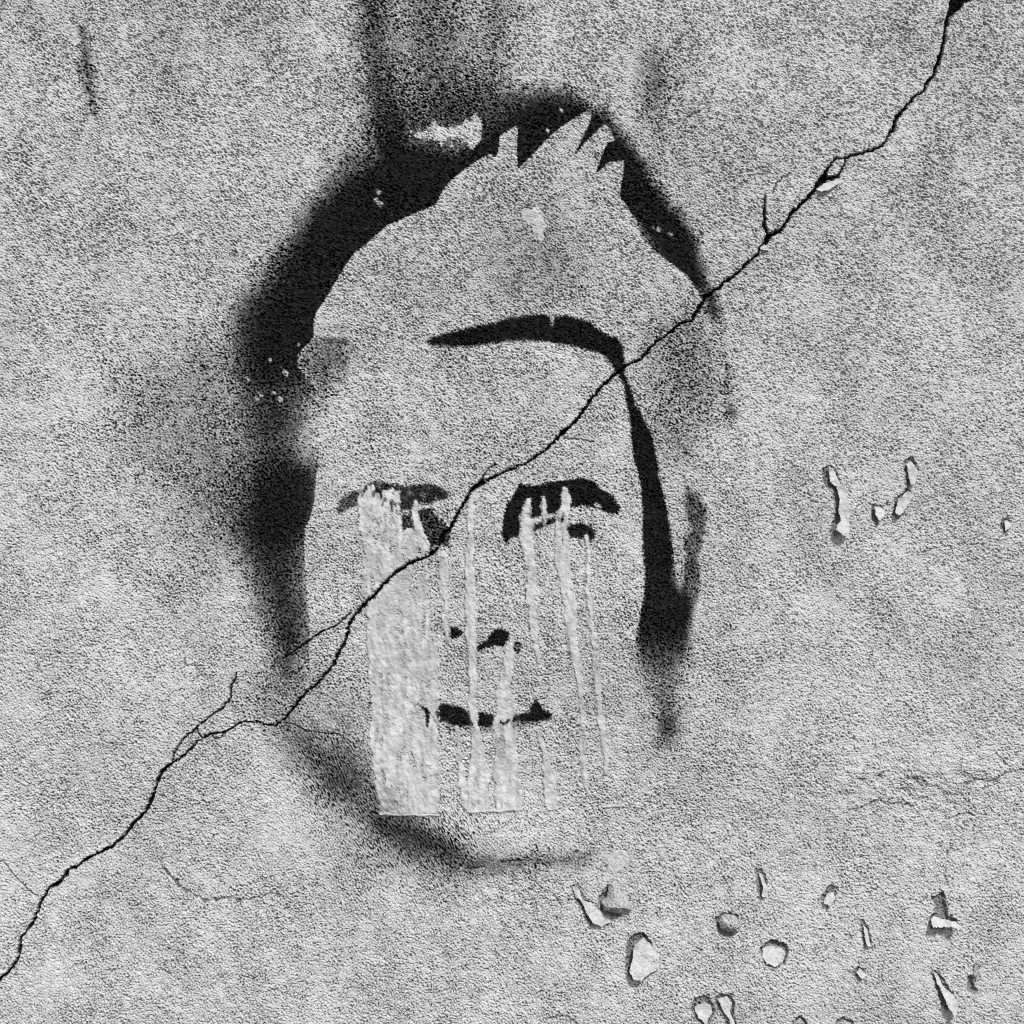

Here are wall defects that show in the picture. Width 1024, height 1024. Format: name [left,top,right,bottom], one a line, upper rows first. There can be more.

crack [204,0,970,739]
peeling [822,465,852,537]
peeling [871,457,918,526]
crack [0,672,237,981]
peeling [570,879,632,927]
peeling [625,932,659,981]
peeling [714,912,741,936]
peeling [760,939,789,969]
peeling [859,919,873,949]
peeling [929,891,960,930]
peeling [691,993,736,1024]
peeling [931,967,958,1017]